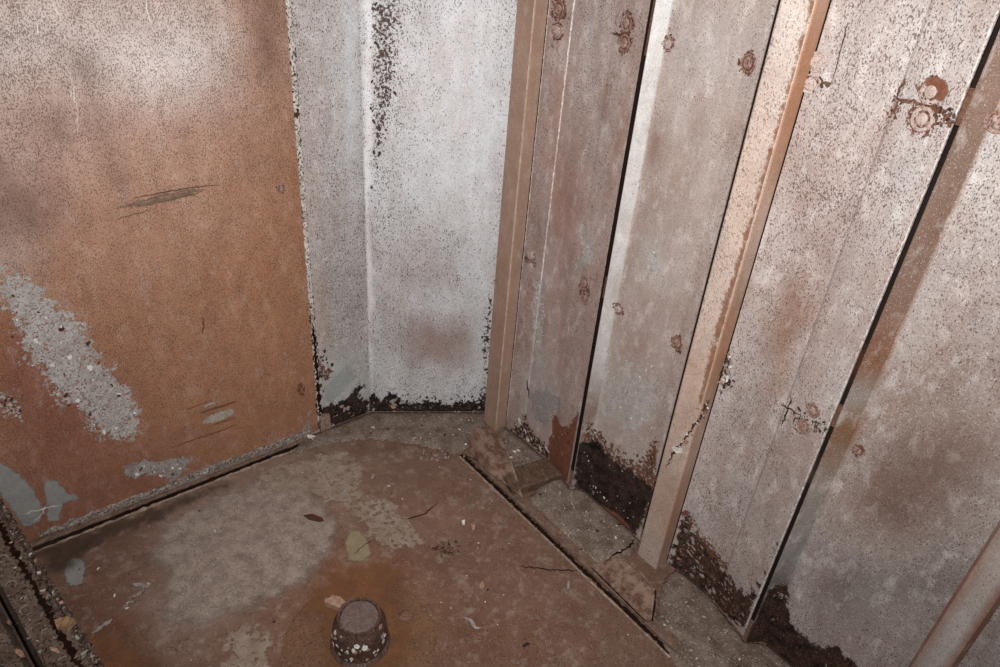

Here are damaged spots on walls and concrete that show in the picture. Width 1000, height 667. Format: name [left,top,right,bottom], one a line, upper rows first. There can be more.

corrosion [550,0,567,41]
corrosion [611,10,635,56]
corrosion [905,75,950,138]
corrosion [699,36,805,403]
peeling [0,261,146,443]
peeling [0,463,79,526]
peeling [122,456,192,482]
water stain [61,382,486,531]
corrosion [548,412,660,492]
water stain [572,441,653,534]
corrosion [792,401,827,435]
water stain [747,585,858,667]